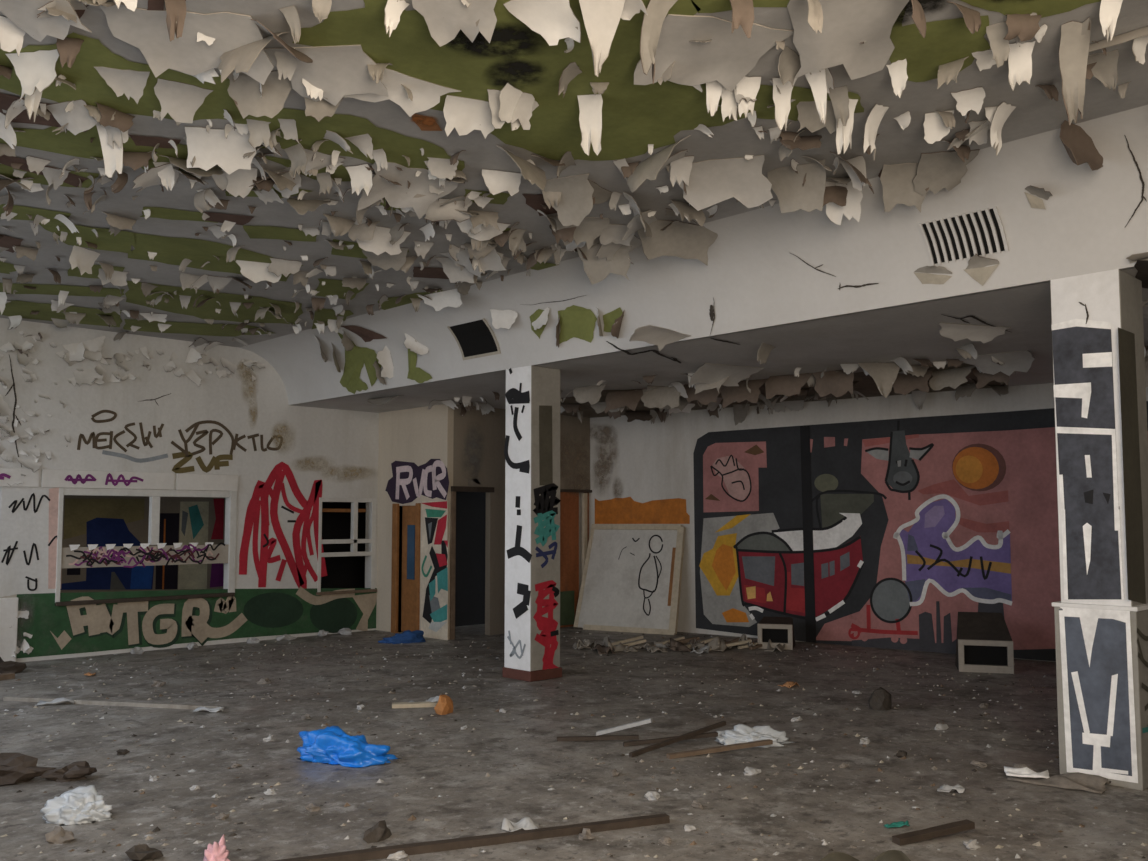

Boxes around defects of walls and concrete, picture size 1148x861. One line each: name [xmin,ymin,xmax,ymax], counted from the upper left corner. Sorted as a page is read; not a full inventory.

peeling [0,0,1148,486]
crack [1124,135,1147,227]